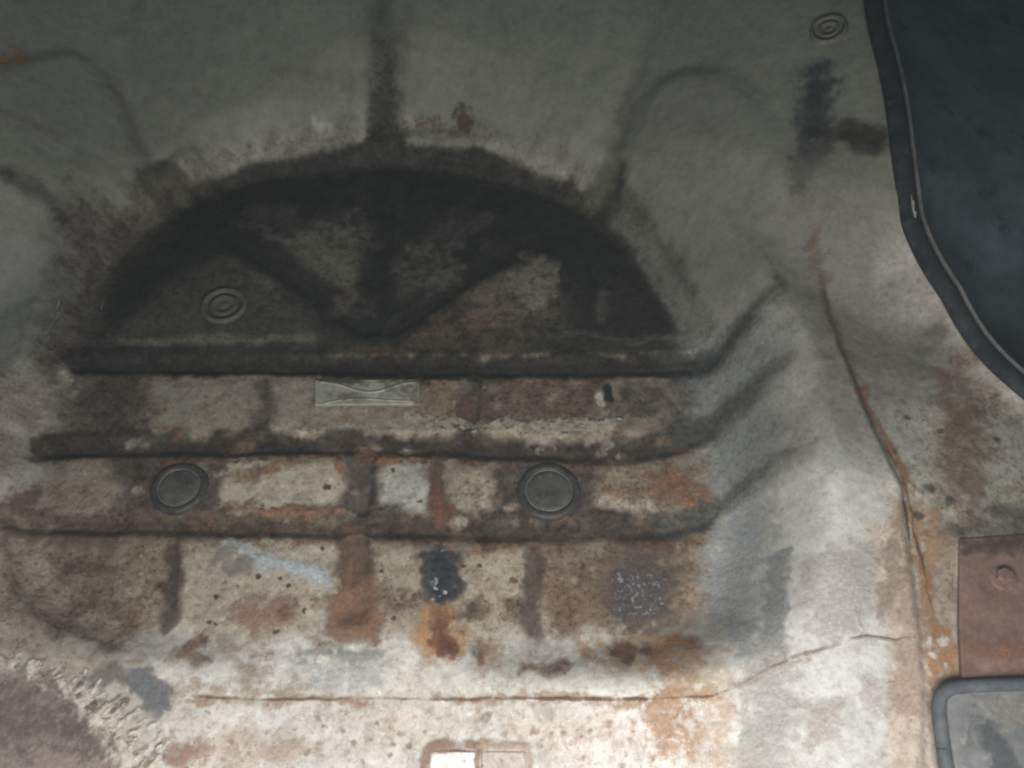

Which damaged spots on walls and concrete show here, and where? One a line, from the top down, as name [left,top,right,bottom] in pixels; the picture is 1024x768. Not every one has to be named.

corrosion [804,228,1024,690]
corrosion [223,503,385,647]
crack [198,695,651,703]
corrosion [410,597,469,663]
crack [685,433,939,699]